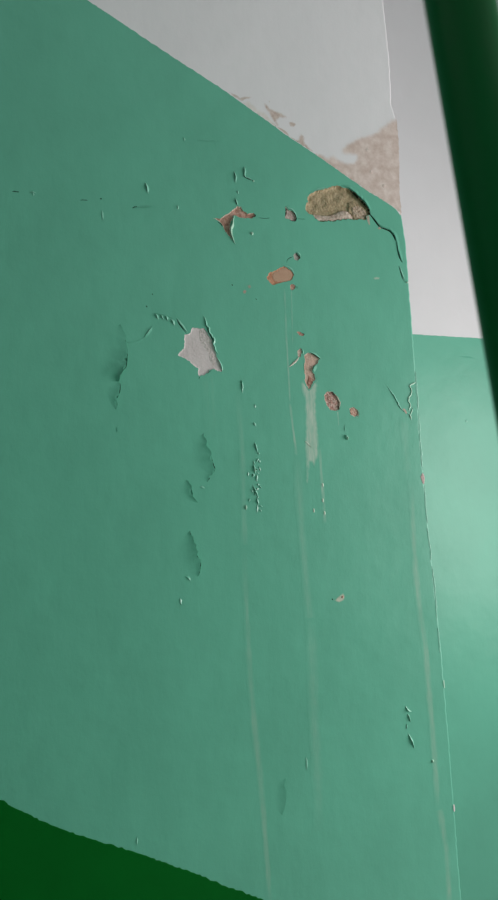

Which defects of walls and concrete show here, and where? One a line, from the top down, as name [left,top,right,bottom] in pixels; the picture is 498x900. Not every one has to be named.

peeling [227,91,401,225]
peeling [214,167,256,240]
flaking render [267,252,301,290]
crack [369,213,408,283]
peeling [177,317,223,378]
peeling [297,348,321,389]
peeling [324,391,359,426]
leakage [283,288,327,837]